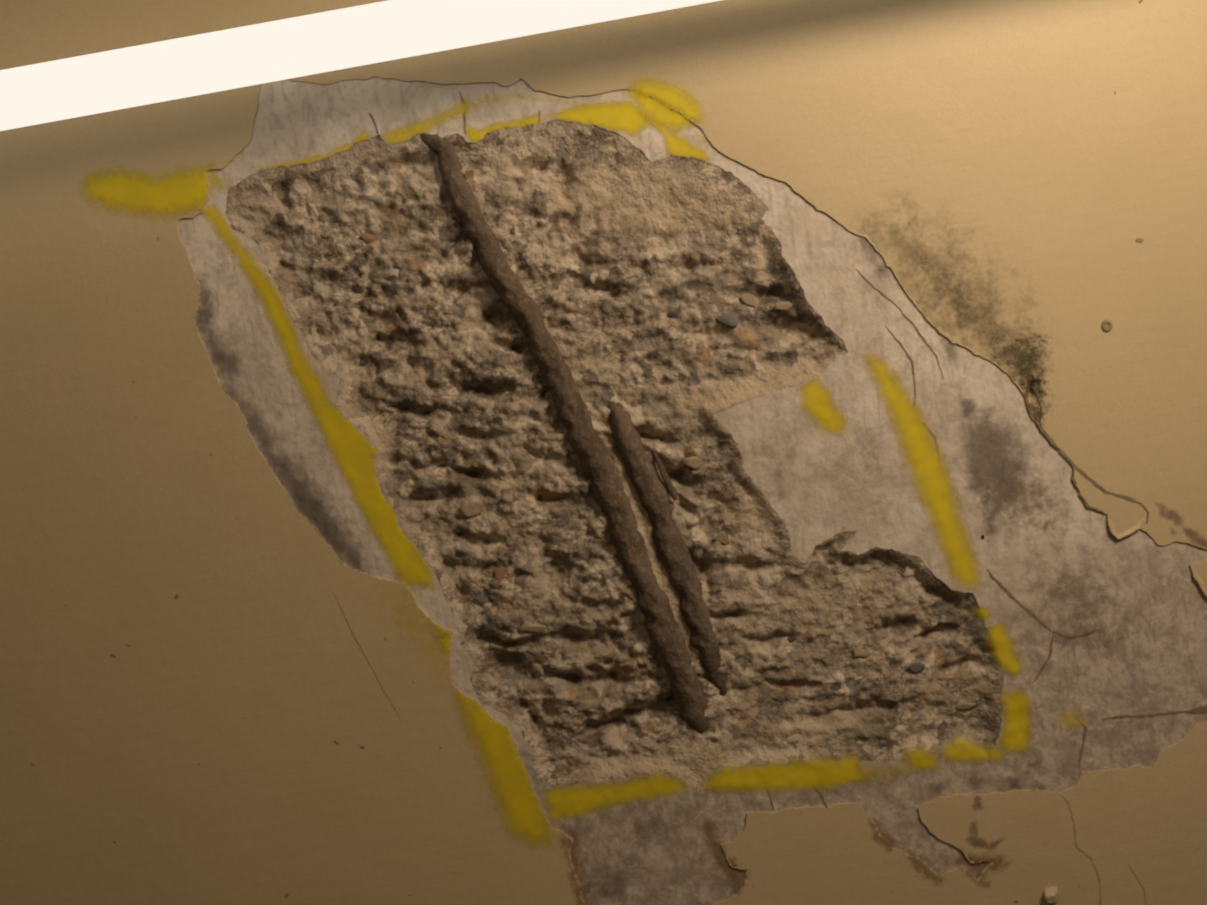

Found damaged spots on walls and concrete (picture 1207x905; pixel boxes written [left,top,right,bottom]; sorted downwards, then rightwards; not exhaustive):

water stain [993,335,1047,422]
spalling [178,77,1207,905]
crack [1076,706,1207,766]
crack [1060,795,1102,905]